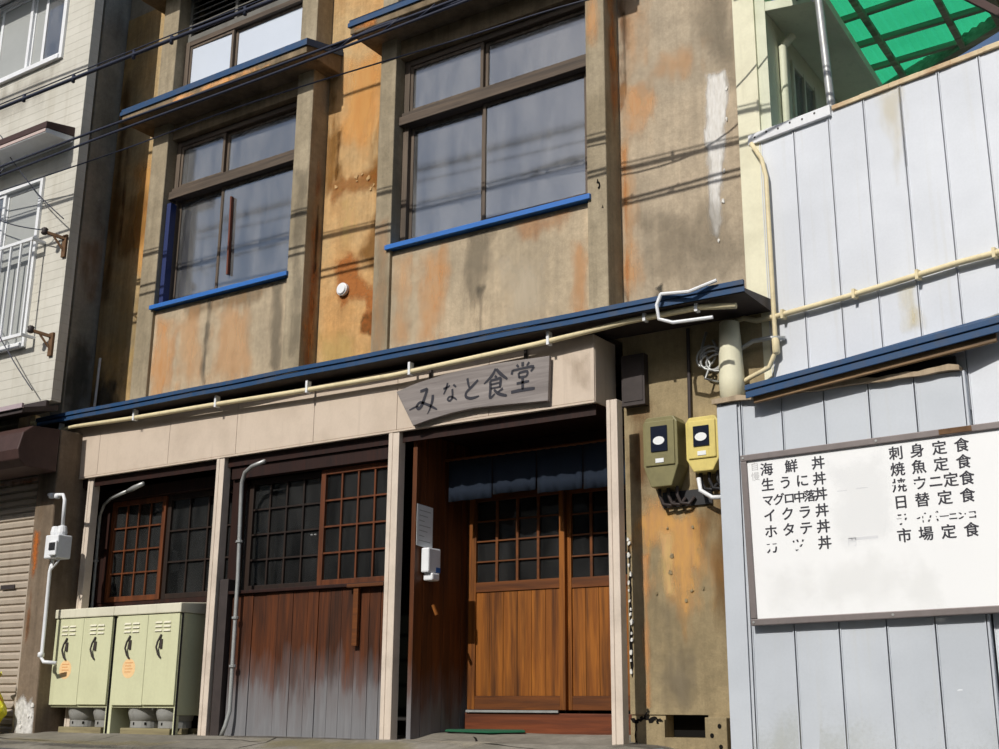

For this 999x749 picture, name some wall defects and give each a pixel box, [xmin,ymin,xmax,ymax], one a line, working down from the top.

rust [608,0,626,74]
rust [106,123,126,289]
rust [336,255,373,335]